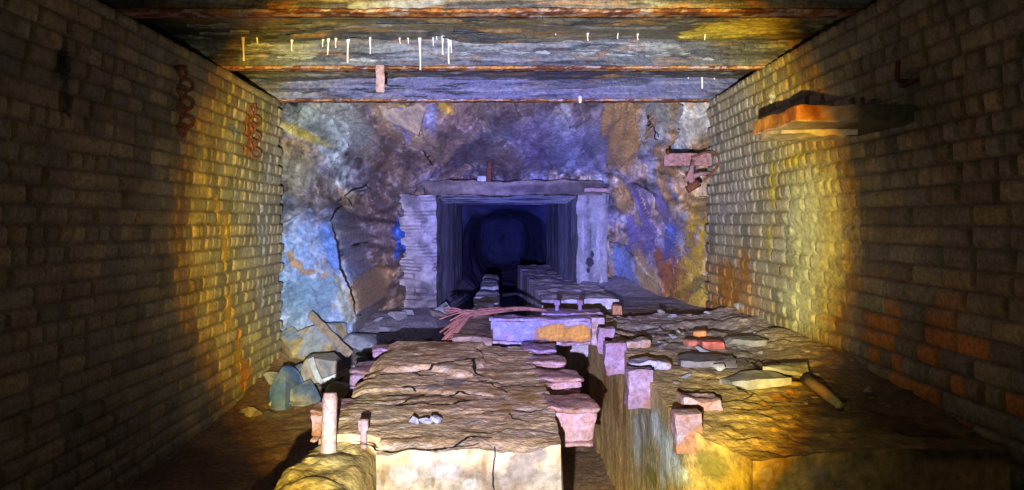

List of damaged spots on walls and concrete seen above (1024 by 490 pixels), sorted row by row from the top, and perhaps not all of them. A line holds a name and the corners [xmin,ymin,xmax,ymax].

crack [330,182,369,316]
crack [345,358,545,490]